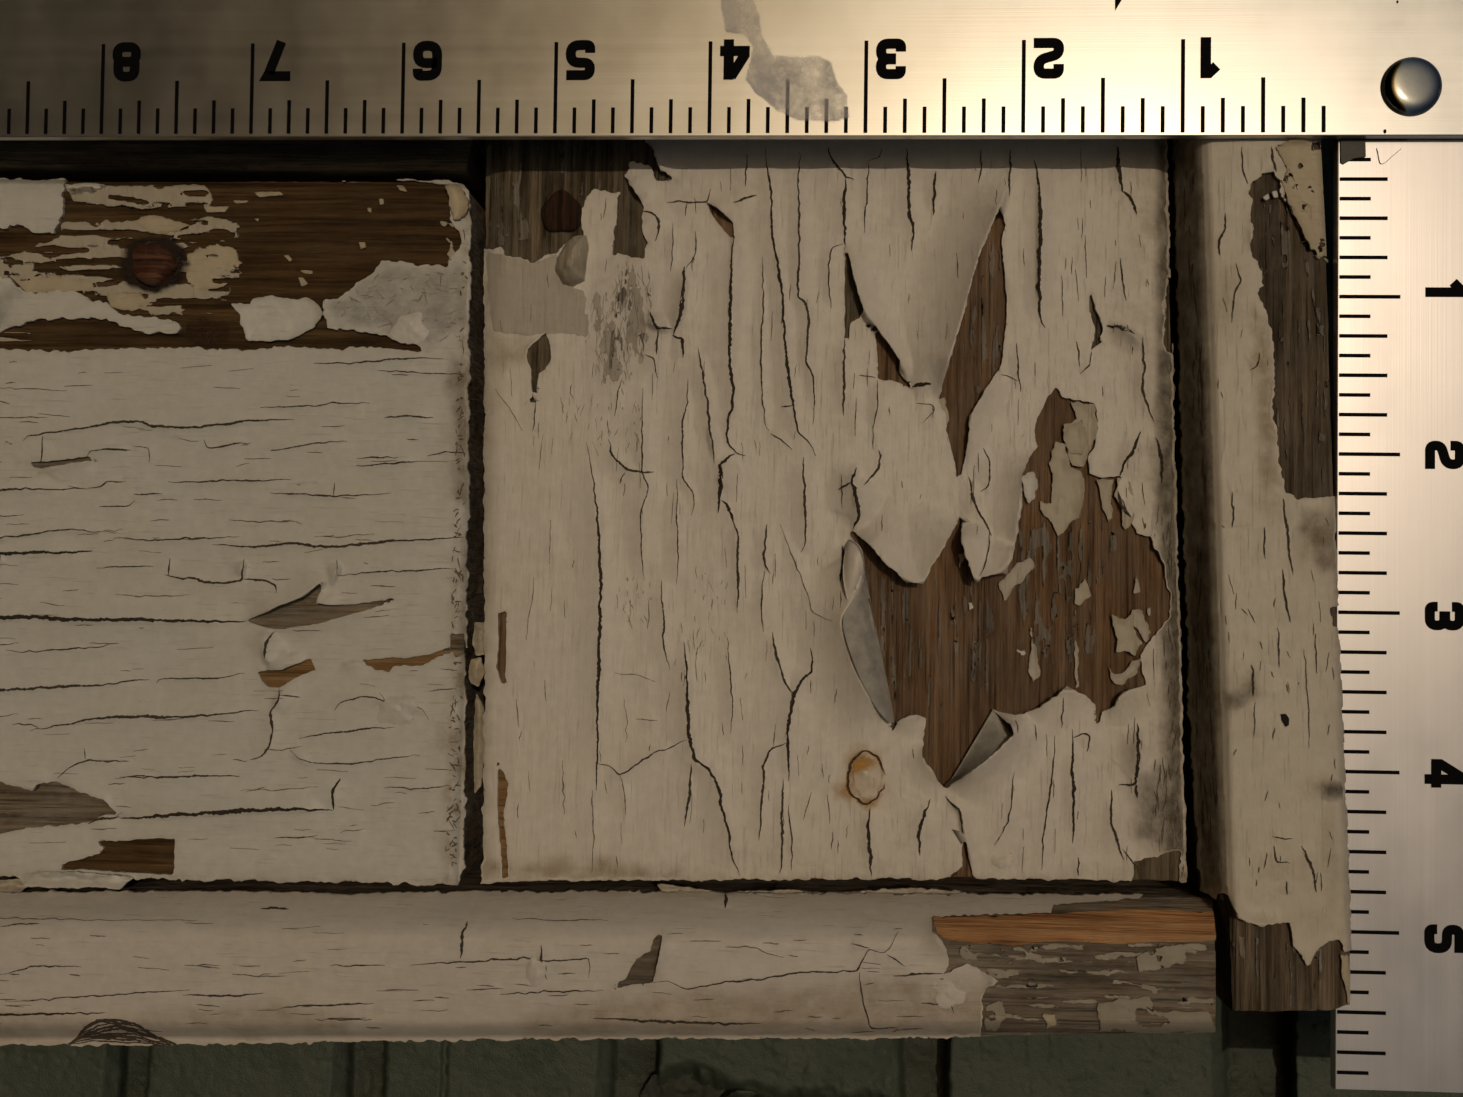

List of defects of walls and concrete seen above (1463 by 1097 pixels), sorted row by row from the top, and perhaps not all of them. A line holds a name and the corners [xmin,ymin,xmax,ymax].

corrosion [120,237,189,292]
peeling [0,140,672,393]
peeling [844,254,910,387]
peeling [939,209,1006,476]
peeling [1248,138,1333,500]
peeling [250,584,391,629]
peeling [850,388,1170,787]
peeling [0,781,116,833]
peeling [19,838,175,889]
peeling [366,611,509,877]
peeling [618,935,662,987]
peeling [931,850,1350,1035]